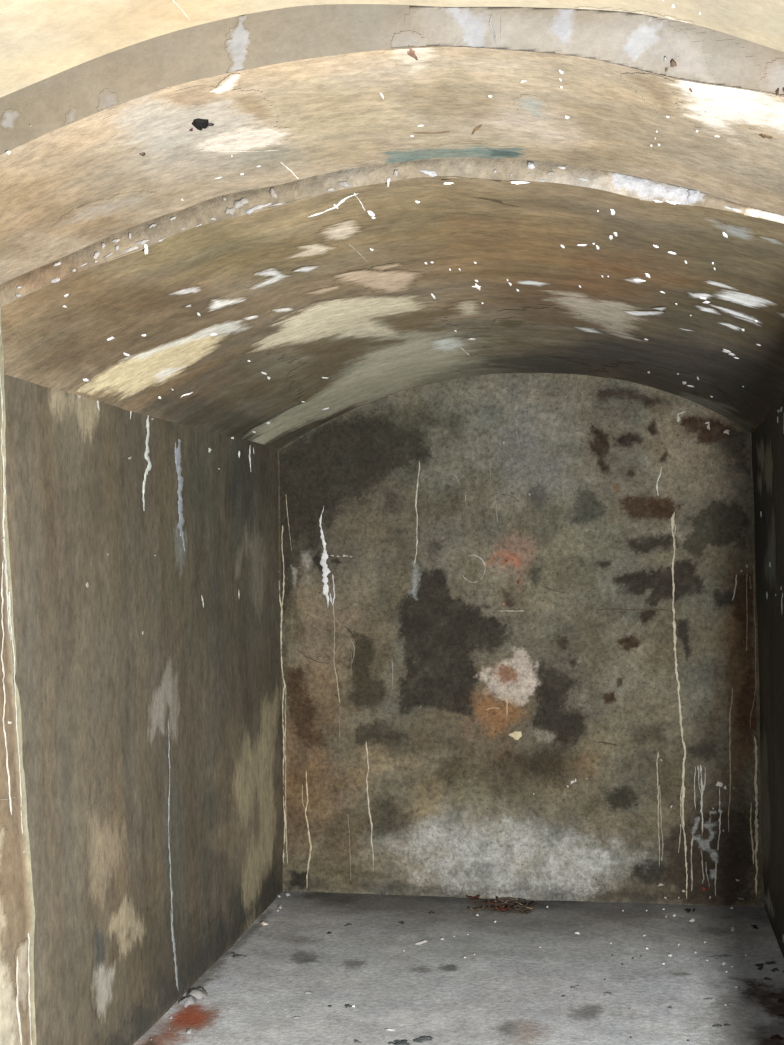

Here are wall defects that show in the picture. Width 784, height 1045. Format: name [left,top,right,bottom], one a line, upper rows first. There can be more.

leakage [0,379,23,834]
leakage [89,400,784,1045]
rust [466,659,584,794]
leakage [16,933,32,1045]
rust [134,999,232,1045]